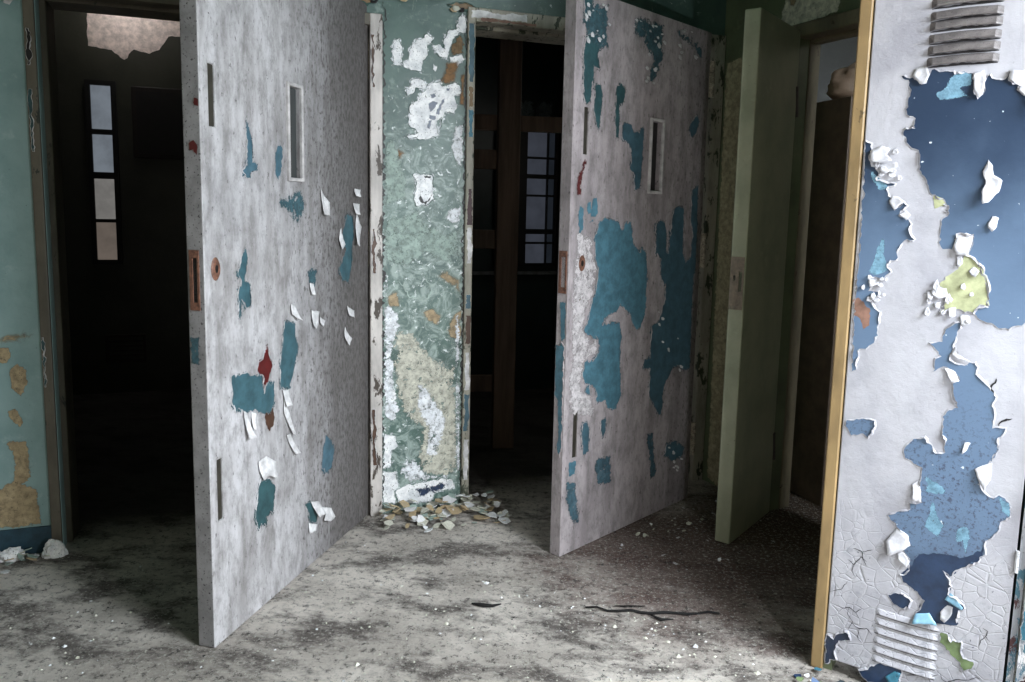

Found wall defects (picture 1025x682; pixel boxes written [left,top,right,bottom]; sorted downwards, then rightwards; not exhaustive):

peeling [781,0,841,26]
peeling [390,1,527,165]
peeling [582,33,644,191]
peeling [413,171,435,207]
peeling [447,189,473,264]
peeling [371,294,471,505]
peeling [554,185,699,523]
peeling [844,417,876,439]
peeling [850,67,1025,672]
peeling [0,441,41,528]
peeling [824,630,851,664]
peeling [858,662,903,682]